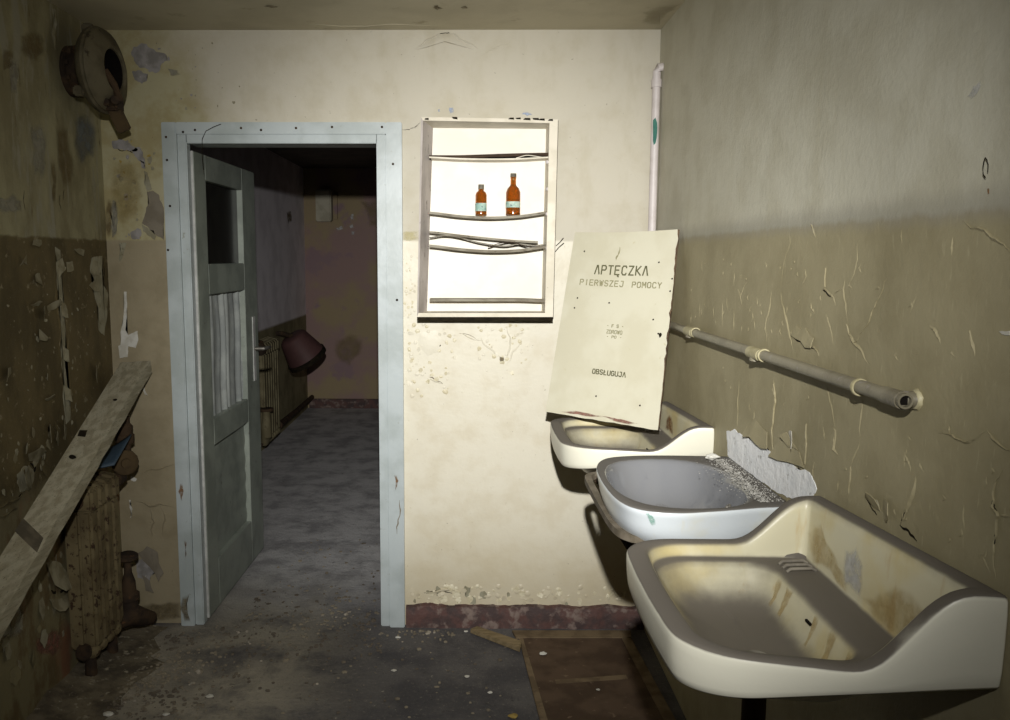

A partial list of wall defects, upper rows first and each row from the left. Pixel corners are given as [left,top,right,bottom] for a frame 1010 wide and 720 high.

flaking render [131,42,177,84]
flaking render [110,139,164,240]
peeling [118,292,138,358]
peeling [2,247,108,496]
flaking render [726,420,817,498]
peeling [410,586,526,605]